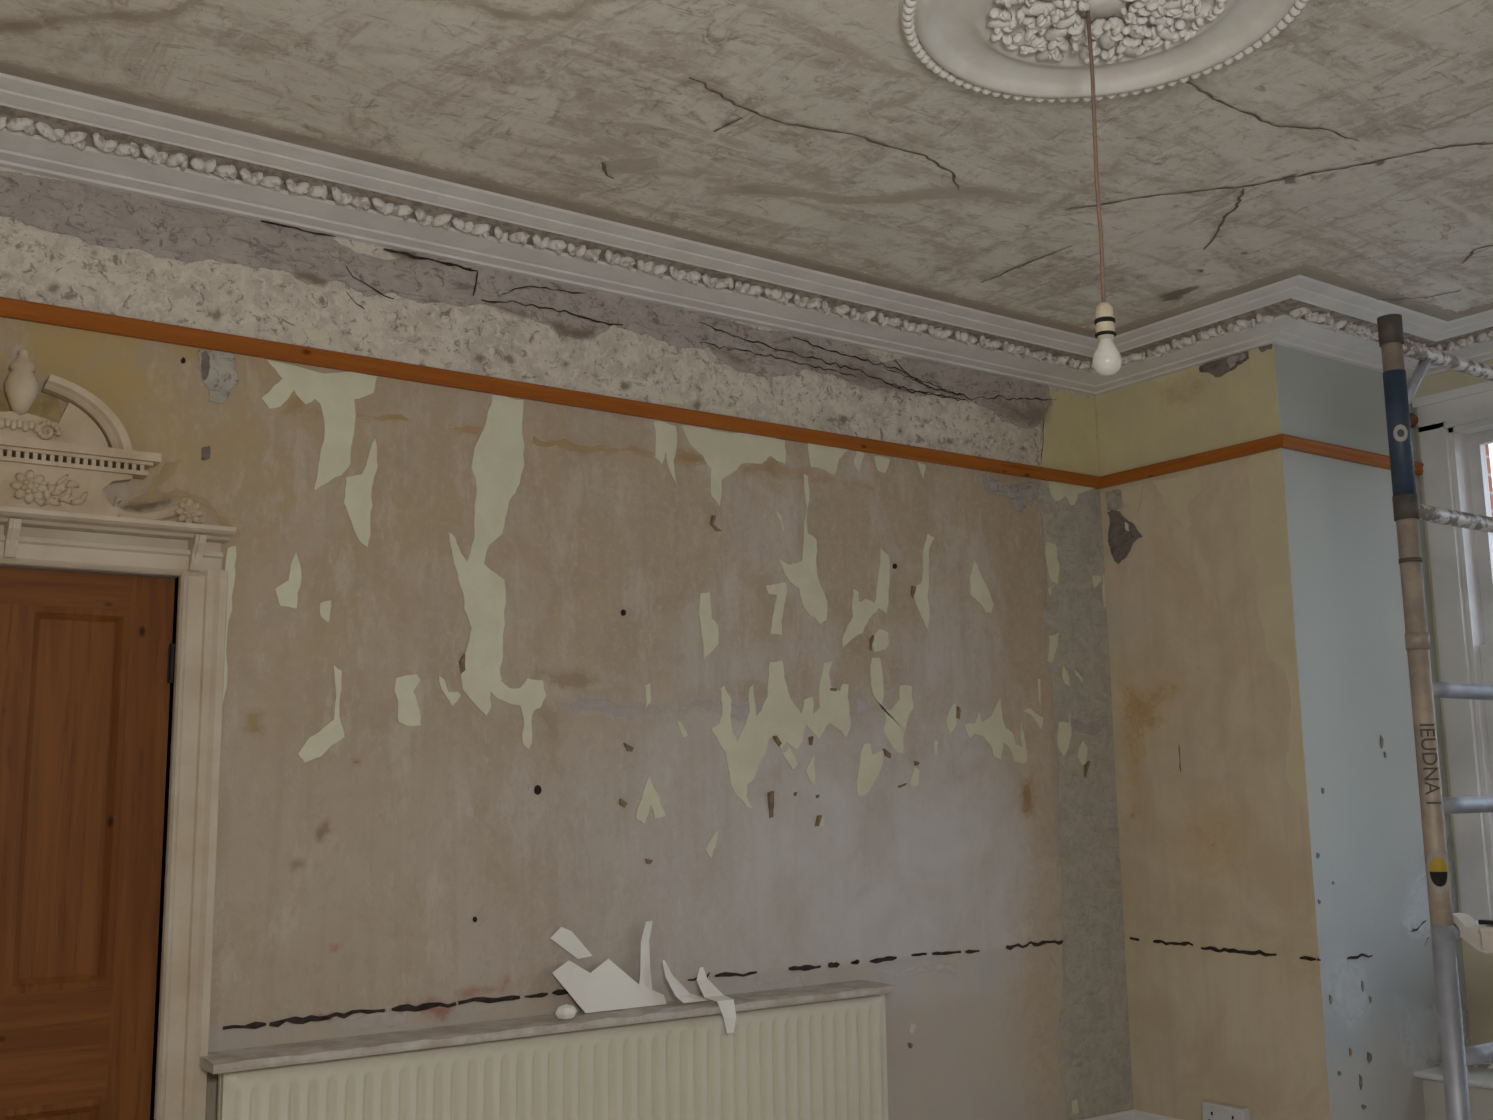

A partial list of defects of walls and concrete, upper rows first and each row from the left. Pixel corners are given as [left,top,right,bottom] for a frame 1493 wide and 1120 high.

crack [689,77,959,190]
crack [1065,82,1493,250]
flaking render [0,171,1056,460]
crack [981,246,1071,283]
peeling [261,360,378,547]
peeling [653,409,786,506]
peeling [439,395,546,749]
peeling [711,542,1090,827]
peeling [1248,448,1325,809]
crack [223,989,569,1030]
crack [688,940,1063,995]
crack [1130,937,1373,961]